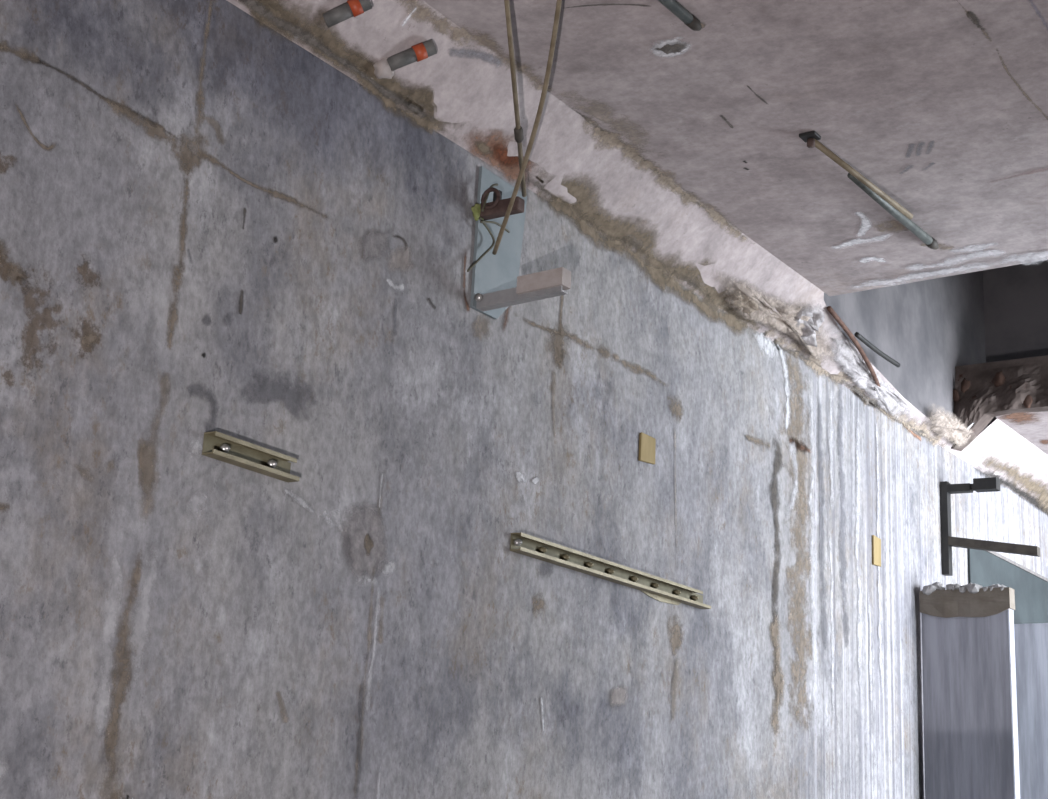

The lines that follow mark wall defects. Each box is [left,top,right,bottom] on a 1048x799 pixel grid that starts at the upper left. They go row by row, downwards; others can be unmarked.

crack [17,107,55,151]
crack [0,41,175,142]
leakage [168,3,224,349]
crack [201,153,327,218]
leakage [241,0,449,133]
rust [471,132,533,183]
crack [966,11,1048,119]
leakage [857,244,1048,287]
spalling [827,306,900,387]
leakage [529,178,944,734]
leakage [977,458,1048,515]
rust [1003,412,1038,423]